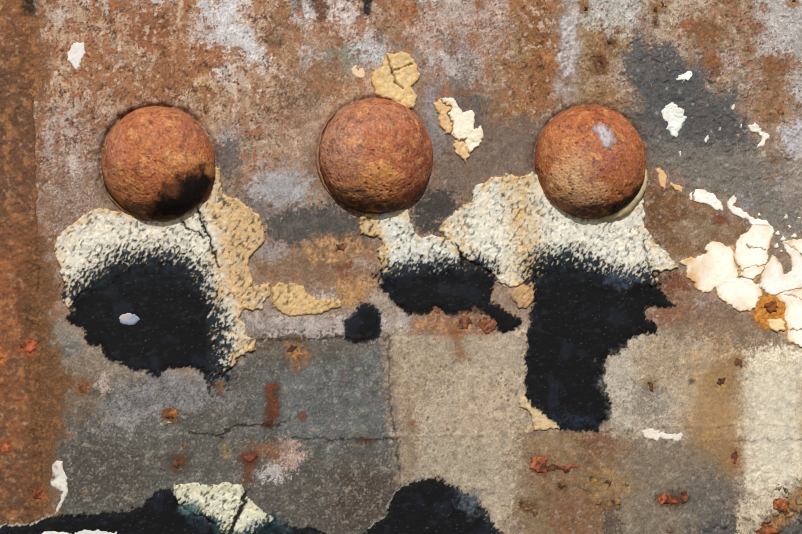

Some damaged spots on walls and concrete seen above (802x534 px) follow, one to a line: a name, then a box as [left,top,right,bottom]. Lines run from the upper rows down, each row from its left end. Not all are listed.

corrosion [21,15,51,100]
peeling [351,51,421,109]
peeling [433,97,484,163]
corrosion [108,194,151,221]
crack [182,208,220,268]
peeling [358,168,802,347]
corrosion [263,383,280,427]
corrosion [529,453,579,491]
corrosion [756,482,802,534]